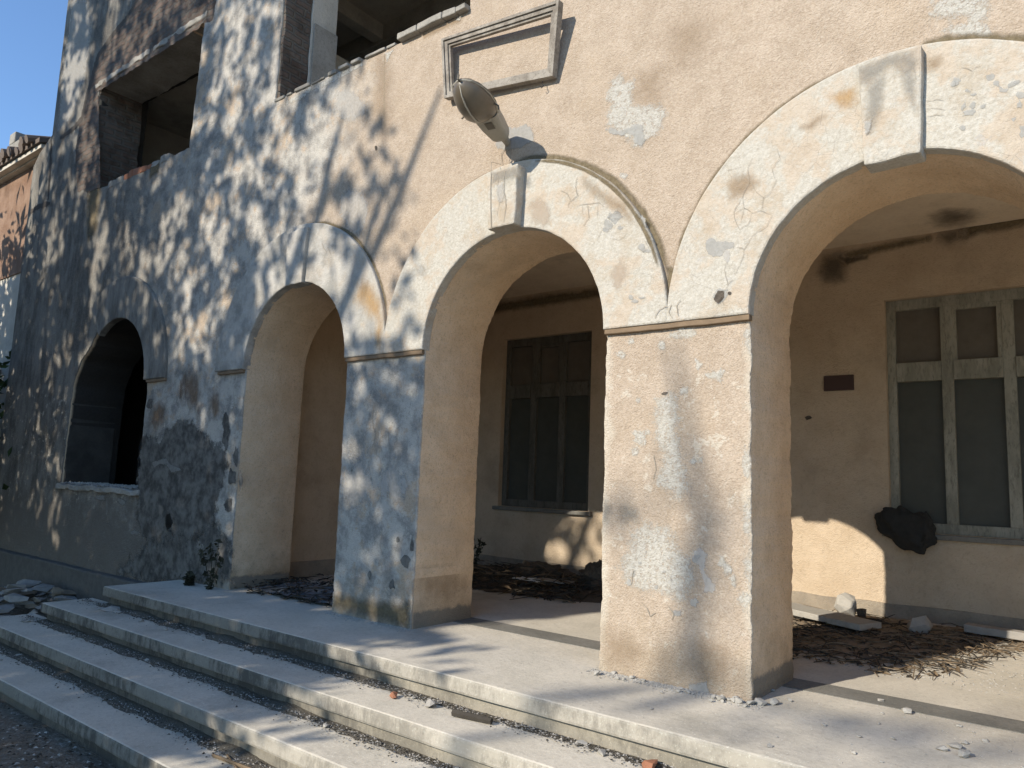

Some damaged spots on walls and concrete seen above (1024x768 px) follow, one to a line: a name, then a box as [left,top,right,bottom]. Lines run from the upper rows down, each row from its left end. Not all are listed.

peeling [606,76,665,147]
peeling [986,74,1024,138]
peeling [706,238,734,263]
crack [721,151,780,300]
peeling [632,387,703,498]
flaking render [95,412,243,584]
peeling [622,523,715,616]